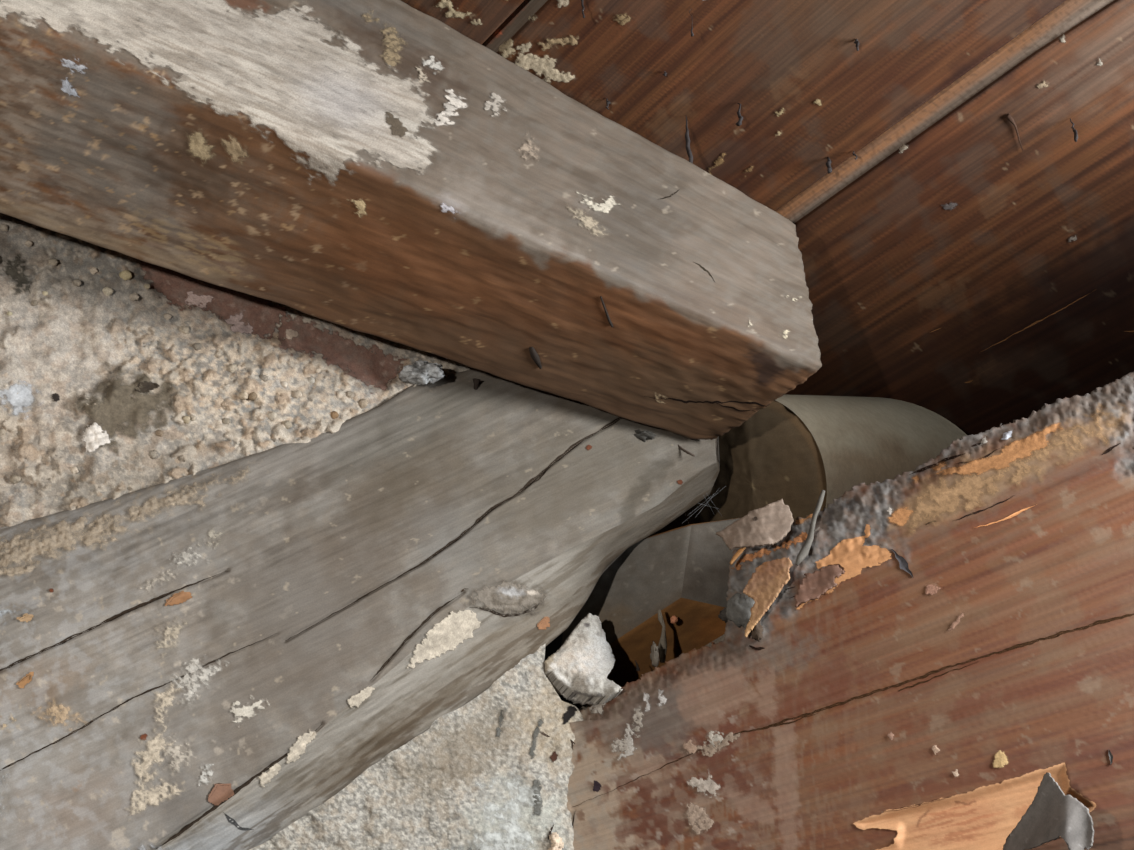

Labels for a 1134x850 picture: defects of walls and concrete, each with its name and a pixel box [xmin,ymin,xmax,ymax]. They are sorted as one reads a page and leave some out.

peeling [794,565,844,607]
crack [733,614,1134,735]
crack [548,746,709,839]
peeling [853,762,1096,850]